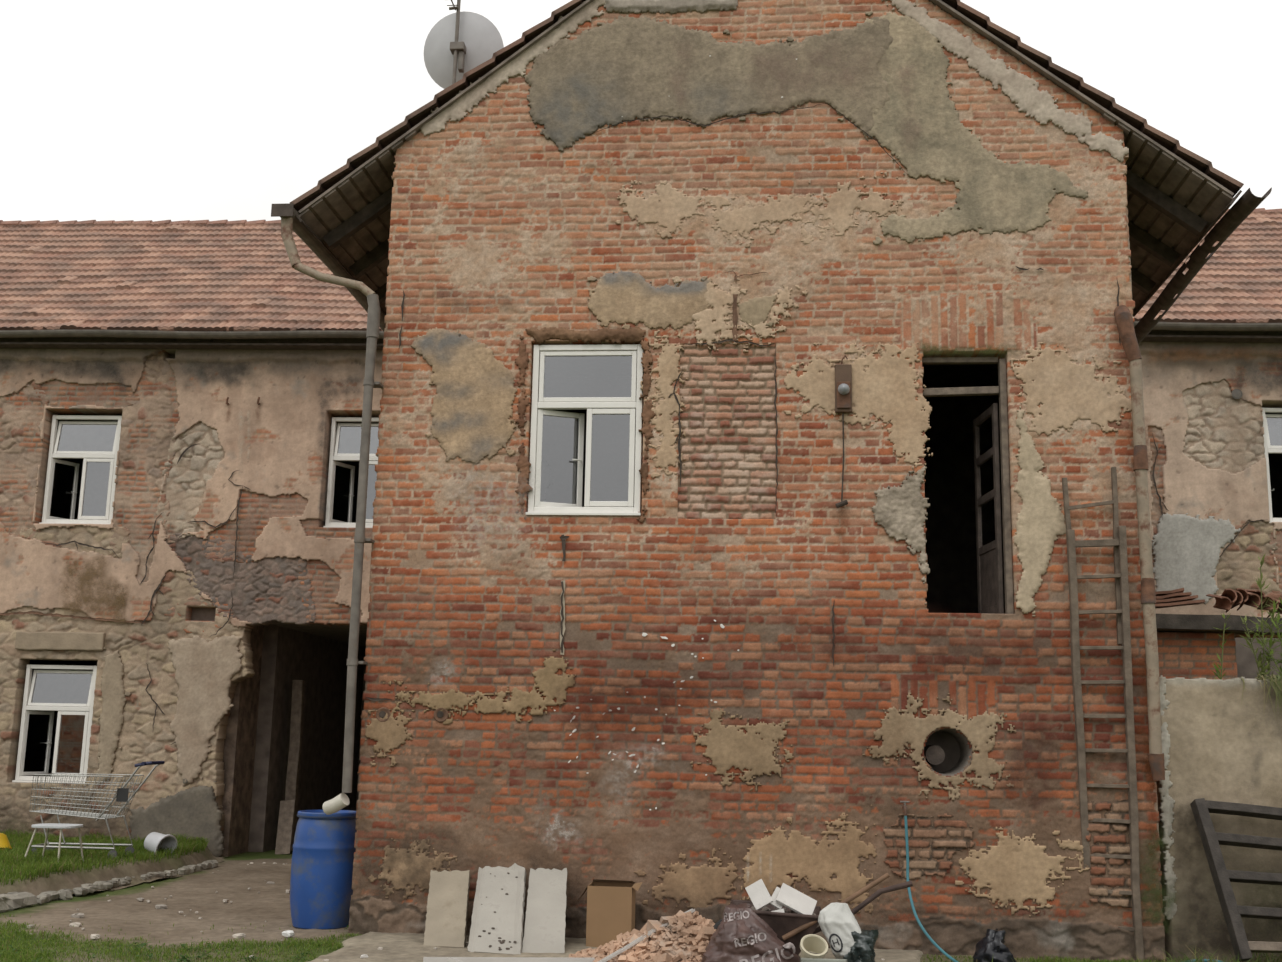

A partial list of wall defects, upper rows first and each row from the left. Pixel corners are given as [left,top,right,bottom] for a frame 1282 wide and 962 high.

peeling [524,11,1088,247]
flaking render [1183,380,1265,474]
crack [41,470,250,636]
flaking render [0,350,373,857]
spalling [1148,426,1166,567]
flaking render [1216,520,1282,600]
crack [145,663,176,745]
hole [925,727,972,776]
peeling [368,838,457,899]
peeling [634,799,1132,917]